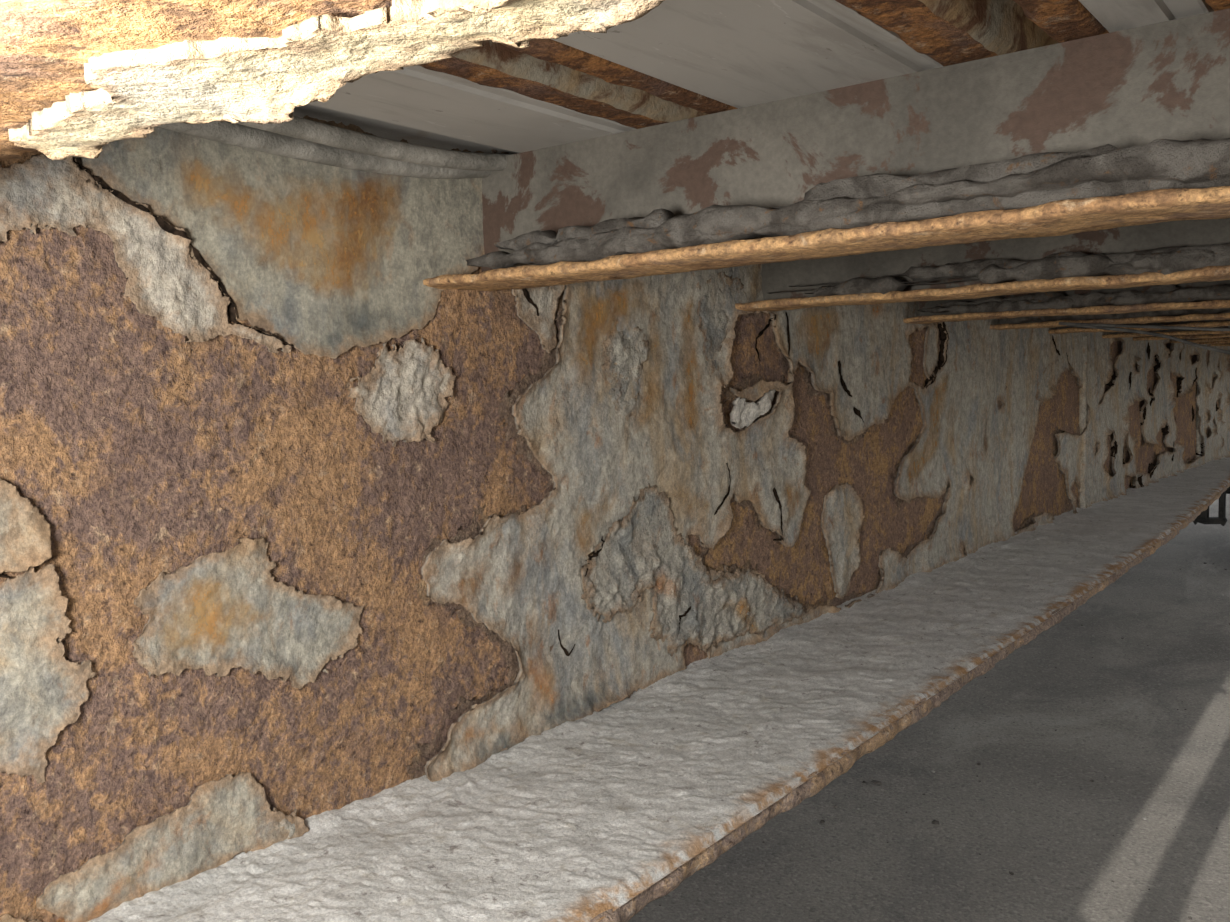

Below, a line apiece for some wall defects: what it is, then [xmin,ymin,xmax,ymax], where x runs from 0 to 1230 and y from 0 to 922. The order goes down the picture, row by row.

corrosion [0,151,42,168]
crack [72,156,292,346]
peeling [0,0,665,447]
corrosion [466,138,1230,274]
peeling [0,478,96,785]
peeling [132,537,364,689]
corrosion [0,225,552,922]
crack [714,463,731,515]
crack [773,487,784,541]
peeling [406,264,1230,782]
crack [838,361,864,422]
corrosion [688,243,1230,607]